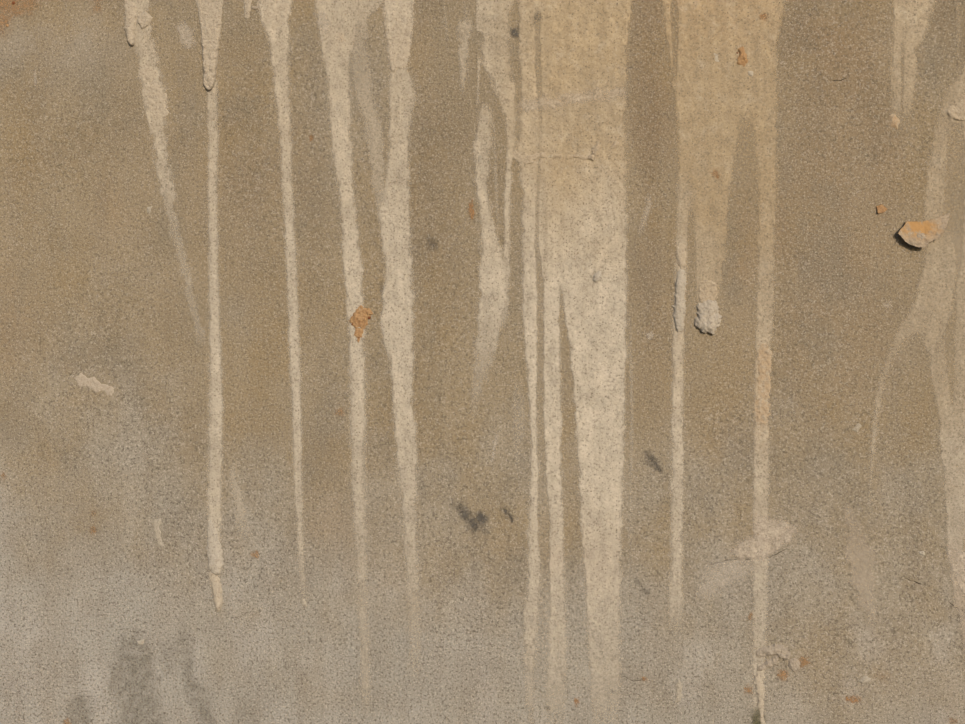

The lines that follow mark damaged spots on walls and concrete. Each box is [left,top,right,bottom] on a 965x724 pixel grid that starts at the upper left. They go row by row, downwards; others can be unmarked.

efflorescence [124,0,175,218]
efflorescence [195,0,224,611]
efflorescence [243,0,305,585]
efflorescence [315,0,418,607]
efflorescence [459,0,632,705]
efflorescence [662,0,785,724]
efflorescence [889,0,934,130]
efflorescence [871,199,965,641]
peeling [897,212,950,248]
efflorescence [924,65,965,221]